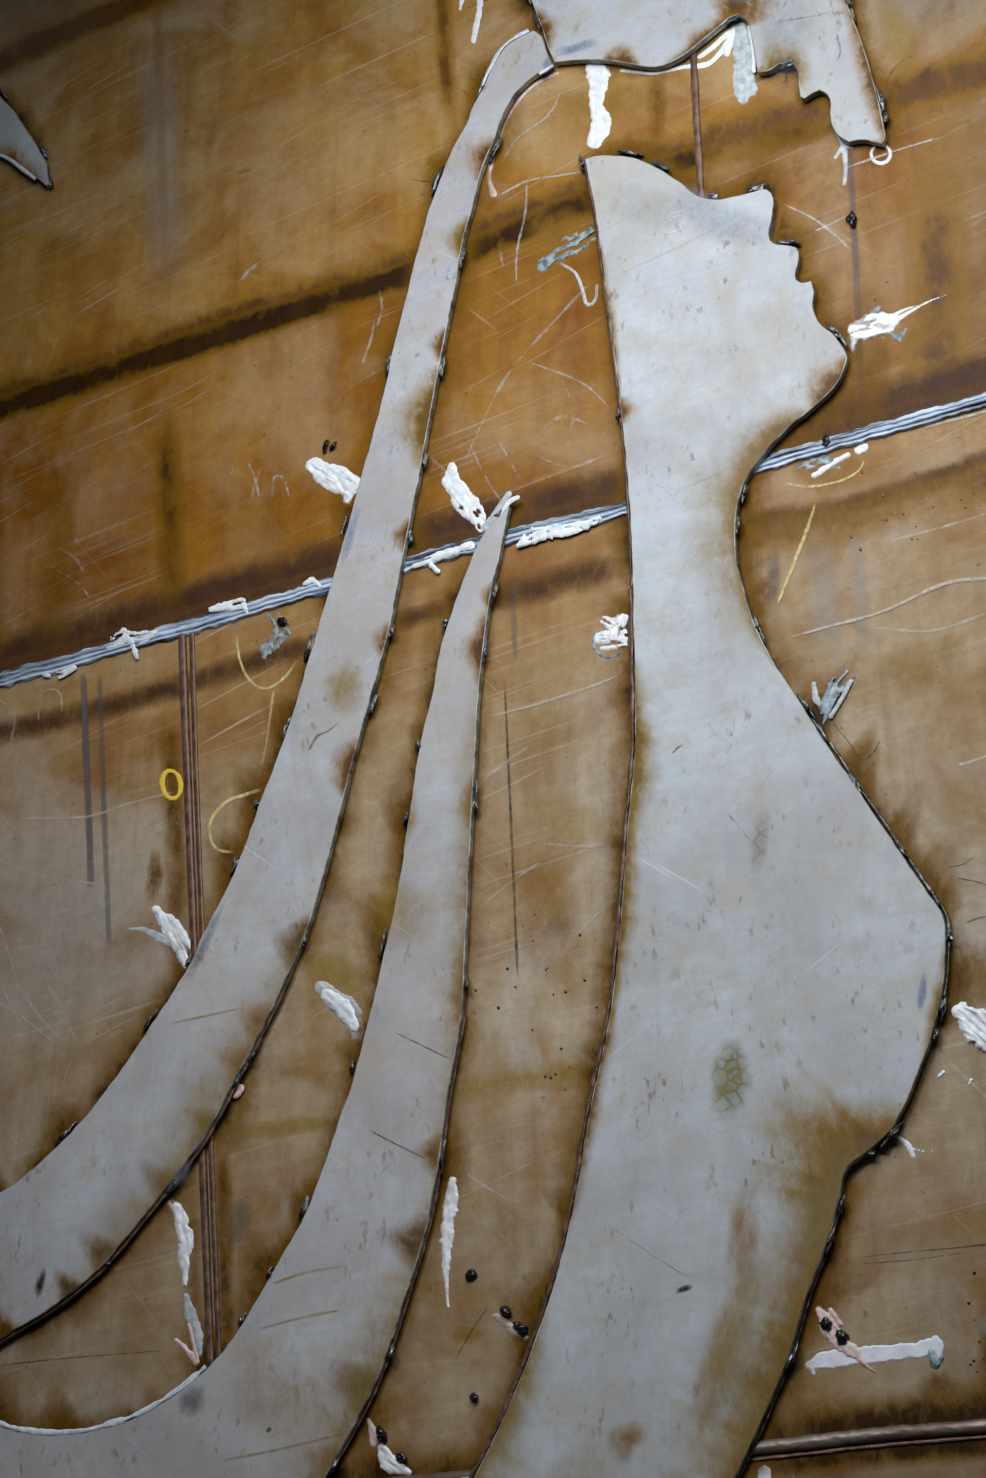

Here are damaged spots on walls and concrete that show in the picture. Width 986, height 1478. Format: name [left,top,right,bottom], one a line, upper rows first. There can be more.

rust [0,0,489,421]
rust [591,49,833,200]
rust [844,0,986,151]
rust [0,640,307,1173]
rust [0,426,354,673]
rust [187,559,471,1376]
rust [317,111,650,1478]
rust [797,680,842,745]
rust [0,1007,271,1340]
rust [710,946,986,1478]
rust [0,1391,135,1430]